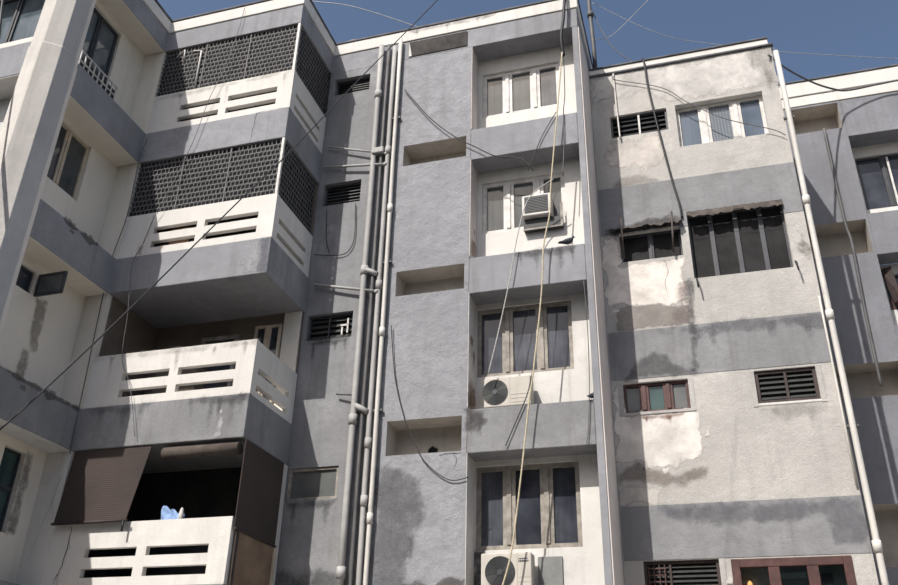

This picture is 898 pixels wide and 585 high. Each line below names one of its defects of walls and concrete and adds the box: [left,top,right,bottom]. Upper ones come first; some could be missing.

peeling [602,237,689,331]
leakage [17,300,47,376]
leakage [628,354,696,379]
peeling [611,386,710,474]
leakage [620,463,706,485]
crack [28,475,72,585]
leakage [374,470,421,585]